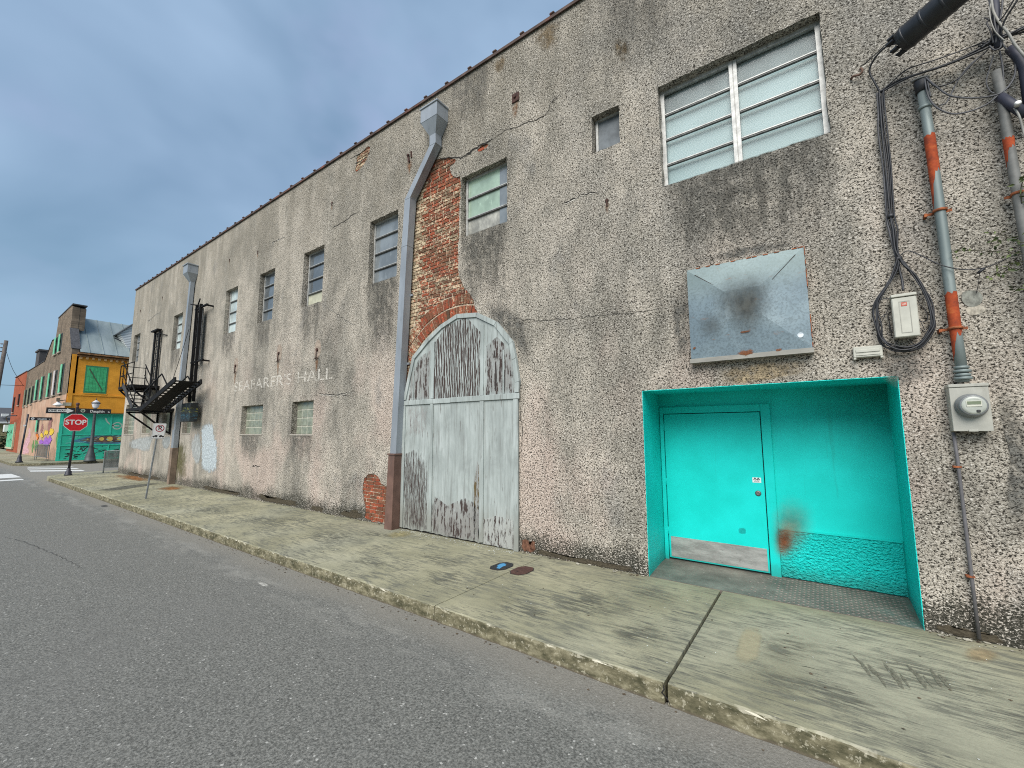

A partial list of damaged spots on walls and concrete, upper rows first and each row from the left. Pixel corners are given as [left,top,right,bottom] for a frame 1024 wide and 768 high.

spalling [356,147,370,172]
crack [444,93,563,160]
damp [679,138,811,232]
corrosion [923,132,940,210]
corrosion [1002,135,1016,168]
spalling [406,158,514,400]
corrosion [944,291,963,360]
spalling [310,474,387,523]
corrosion [780,522,796,548]